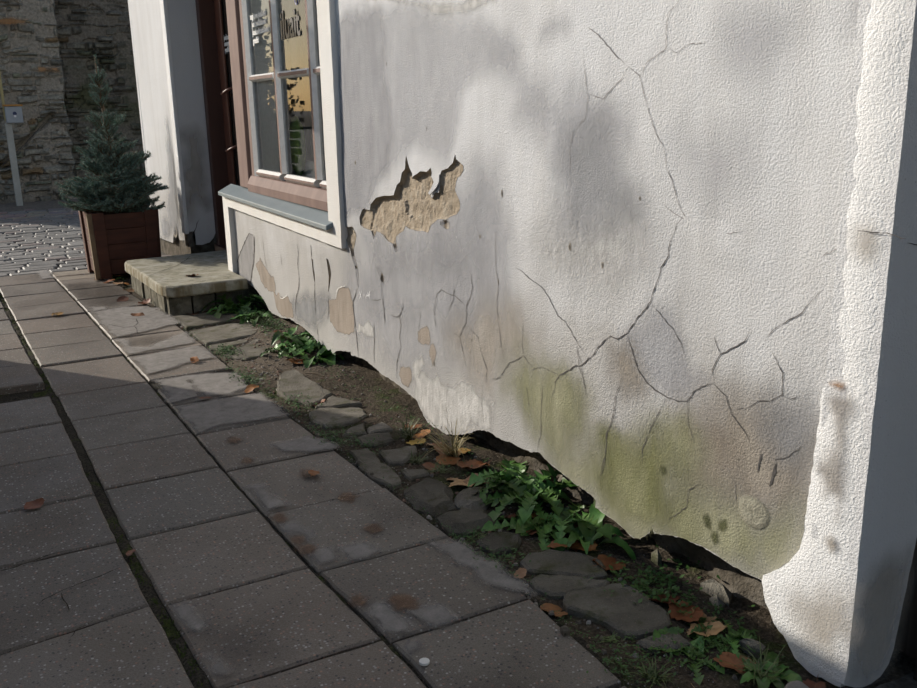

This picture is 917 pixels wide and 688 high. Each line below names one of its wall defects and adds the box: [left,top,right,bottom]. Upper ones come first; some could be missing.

damp [339,0,512,212]
damp [561,135,626,221]
peeling [256,259,294,318]
crack [237,233,331,334]
spalling [329,156,463,335]
crack [353,0,817,477]
mould [704,515,727,544]